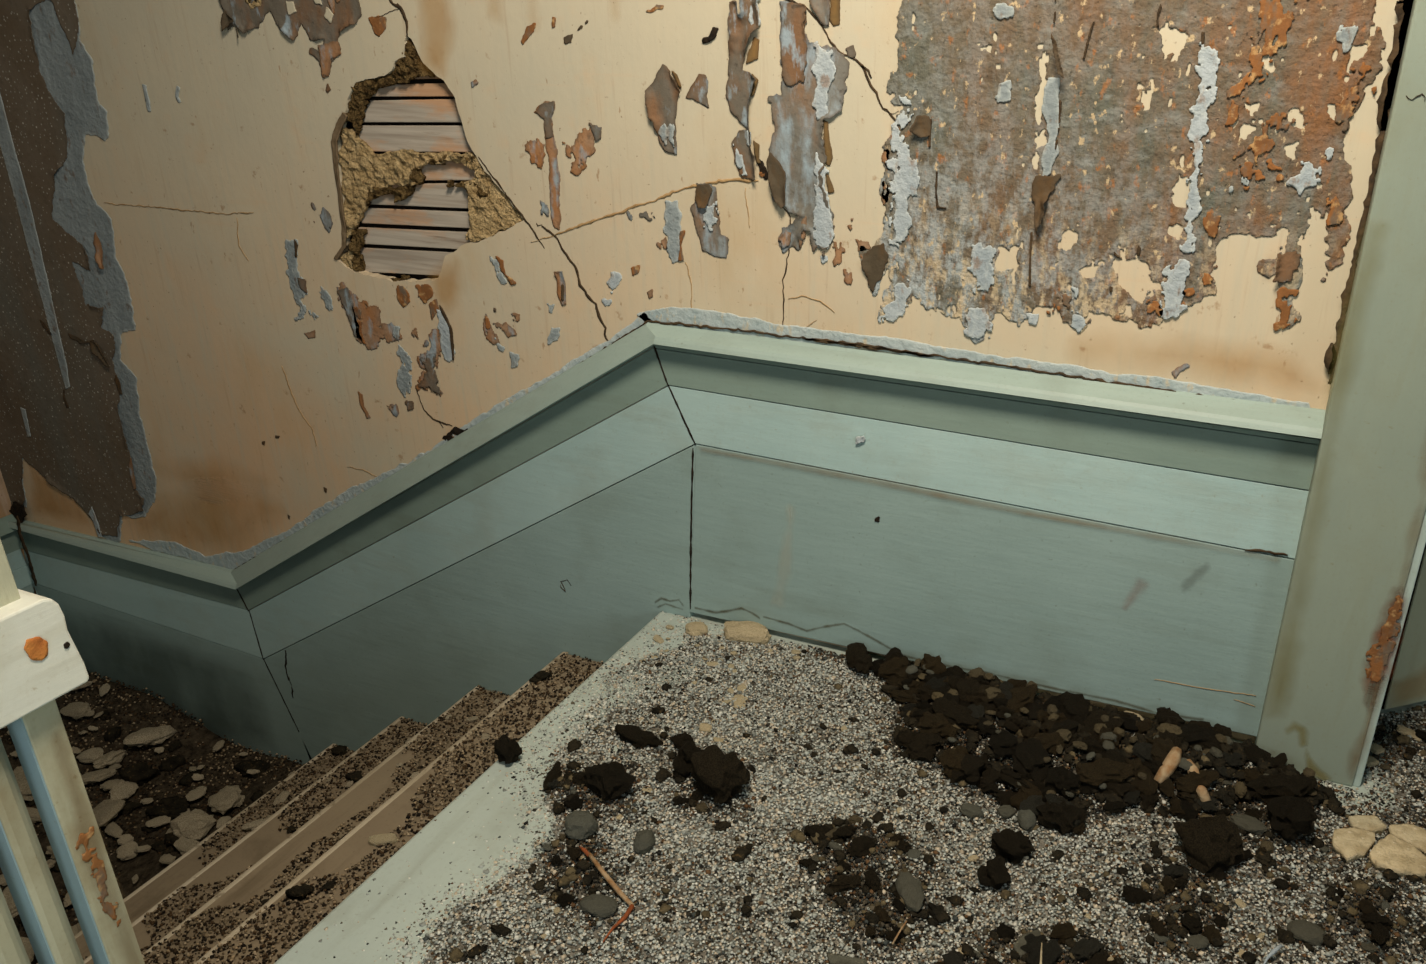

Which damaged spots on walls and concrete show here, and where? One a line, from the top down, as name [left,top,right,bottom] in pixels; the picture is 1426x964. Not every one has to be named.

peeling [811,41,836,120]
spalling [311,38,523,285]
peeling [524,138,546,169]
peeling [733,130,768,180]
peeling [881,149,891,205]
peeling [626,200,685,264]
peeling [387,309,456,417]
crack [478,157,1236,609]
spalling [442,427,468,442]
crack [16,515,37,594]
rust [1365,595,1403,694]
rust [75,826,121,927]